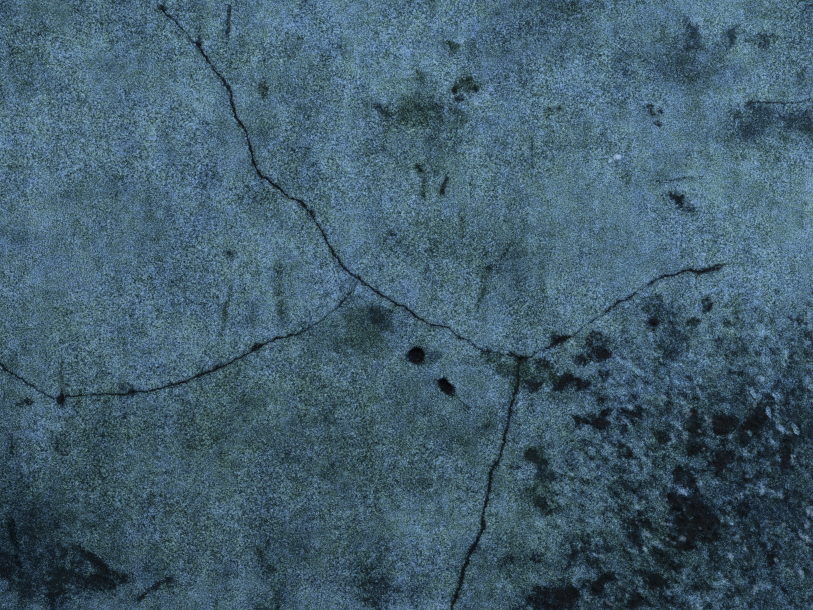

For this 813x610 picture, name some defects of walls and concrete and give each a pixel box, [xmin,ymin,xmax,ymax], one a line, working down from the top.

crack [0,280,359,407]
crack [154,0,731,610]
damp [546,324,651,498]
damp [683,292,718,331]
damp [497,548,549,568]
damp [506,396,813,610]